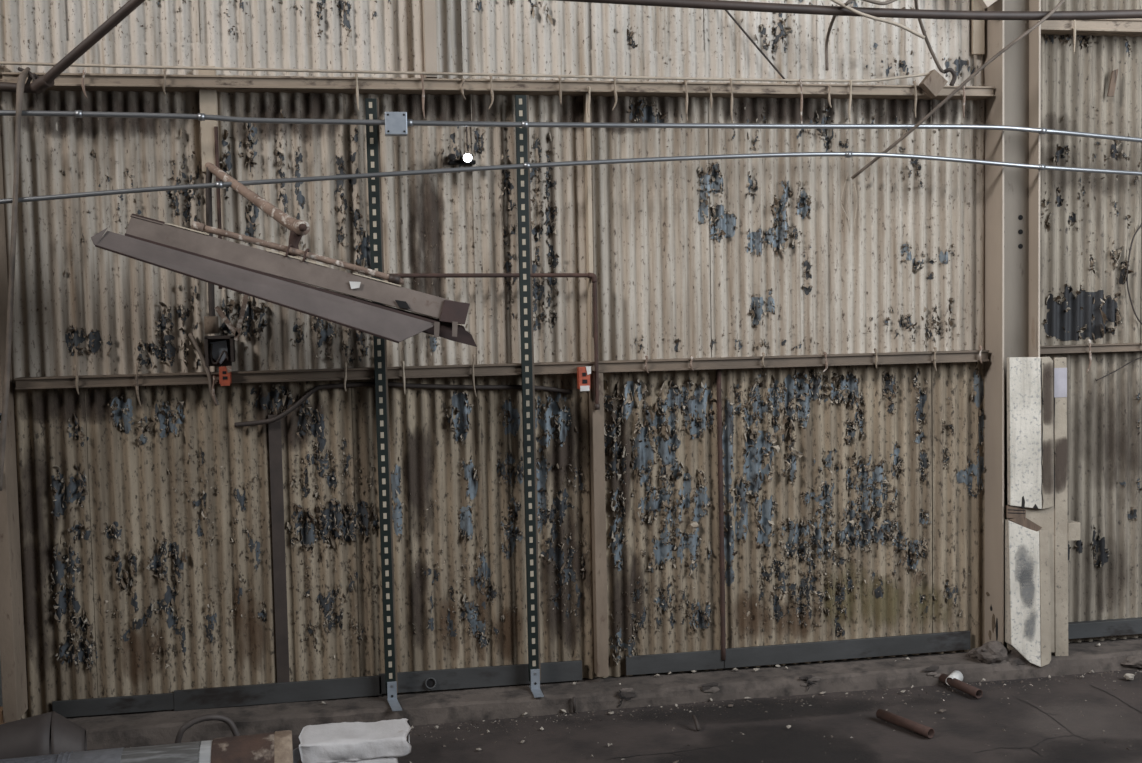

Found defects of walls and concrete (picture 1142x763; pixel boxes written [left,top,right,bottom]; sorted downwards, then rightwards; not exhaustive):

peeling [693,0,850,67]
peeling [398,119,517,341]
peeling [530,130,559,354]
peeling [659,288,828,352]
peeling [697,107,812,295]
peeling [855,241,965,347]
peeling [1040,114,1141,343]
peeling [50,394,267,672]
peeling [250,383,411,658]
peeling [403,390,590,649]
peeling [604,368,971,665]
peeling [912,368,986,497]